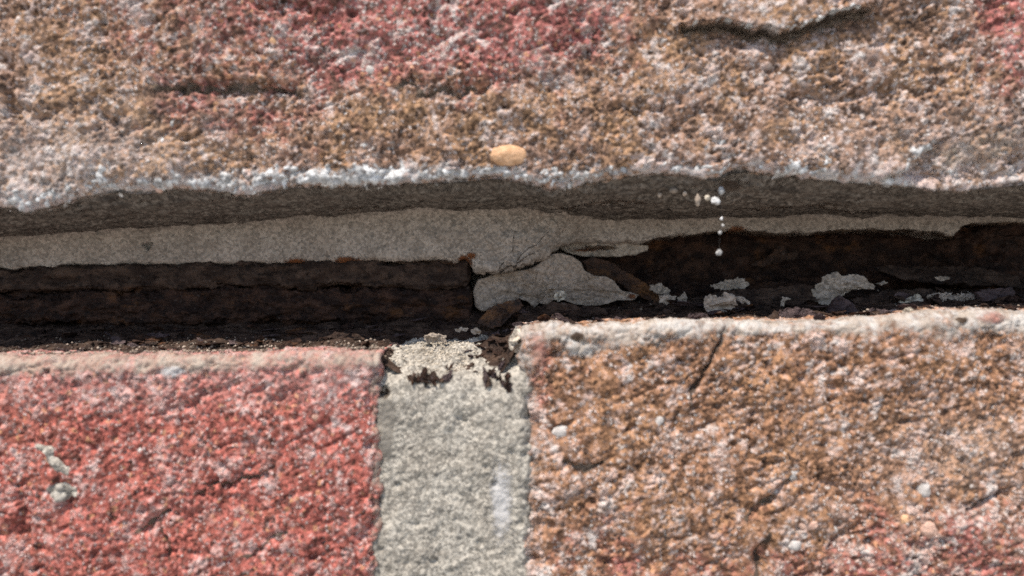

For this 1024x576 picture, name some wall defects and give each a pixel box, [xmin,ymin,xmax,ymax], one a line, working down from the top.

crack [680,3,871,45]
crack [689,324,729,408]